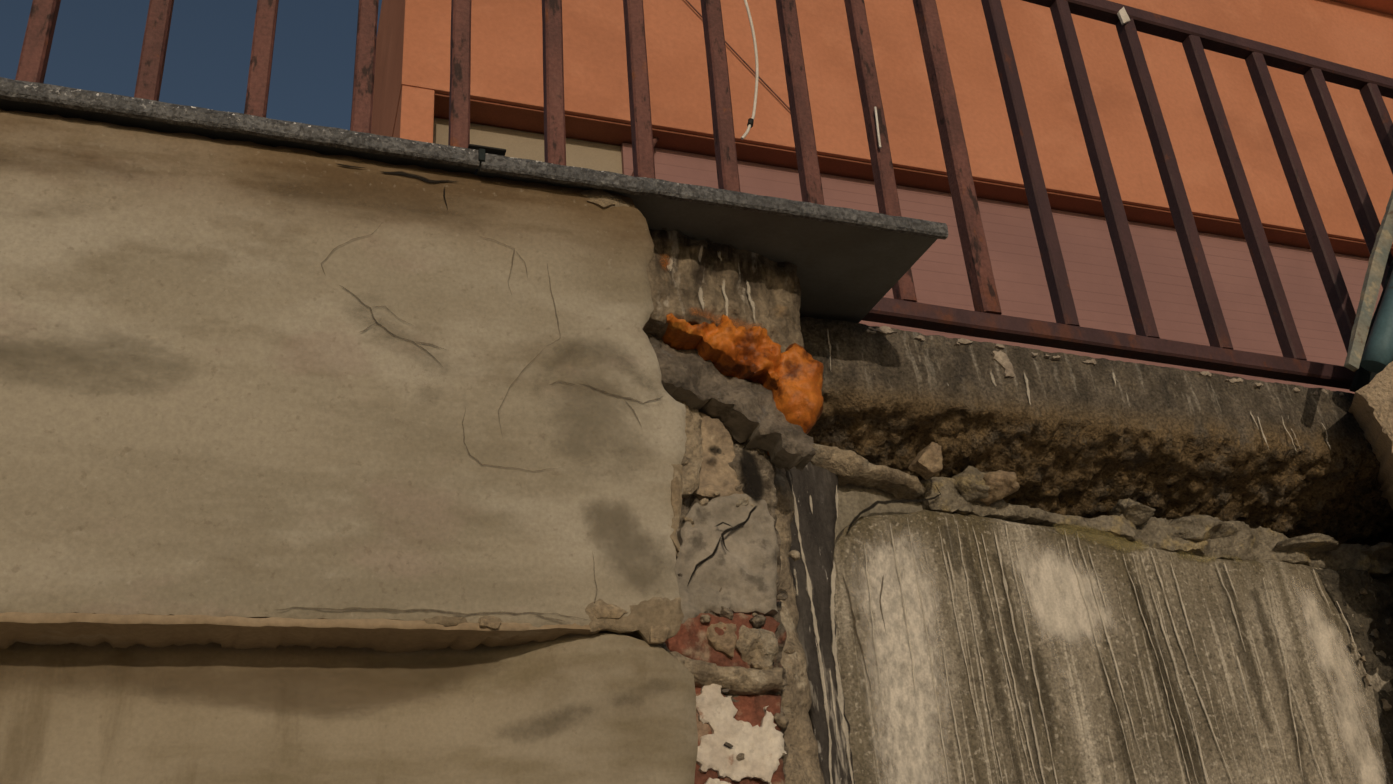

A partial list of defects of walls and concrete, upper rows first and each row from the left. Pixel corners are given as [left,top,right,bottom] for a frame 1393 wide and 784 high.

crack [337,164,458,209]
crack [321,227,443,360]
crack [483,237,662,433]
spalling [992,344,1015,378]
spalling [1198,371,1263,388]
crack [688,506,757,584]
peeling [696,684,787,784]
damp [789,472,854,784]
damp [855,518,1144,784]
damp [1123,551,1233,784]
damp [1297,569,1384,784]
spalling [1312,568,1393,759]